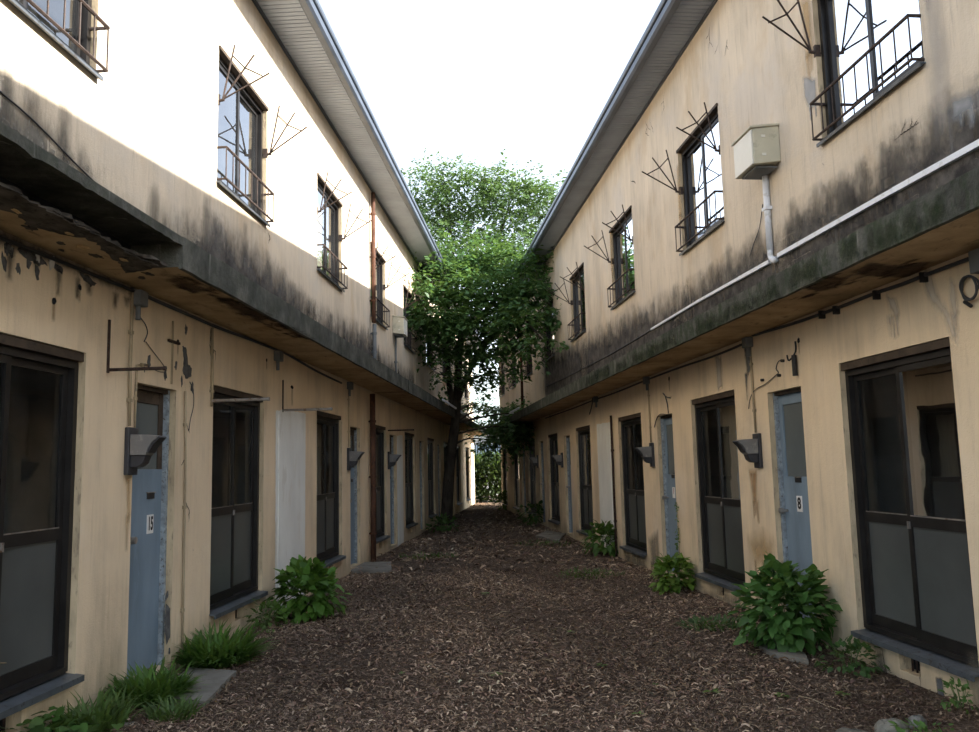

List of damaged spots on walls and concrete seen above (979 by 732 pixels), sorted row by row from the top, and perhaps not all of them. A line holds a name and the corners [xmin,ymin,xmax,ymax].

spalling [0,184,159,280]
damp [169,221,413,383]
damp [544,93,979,397]